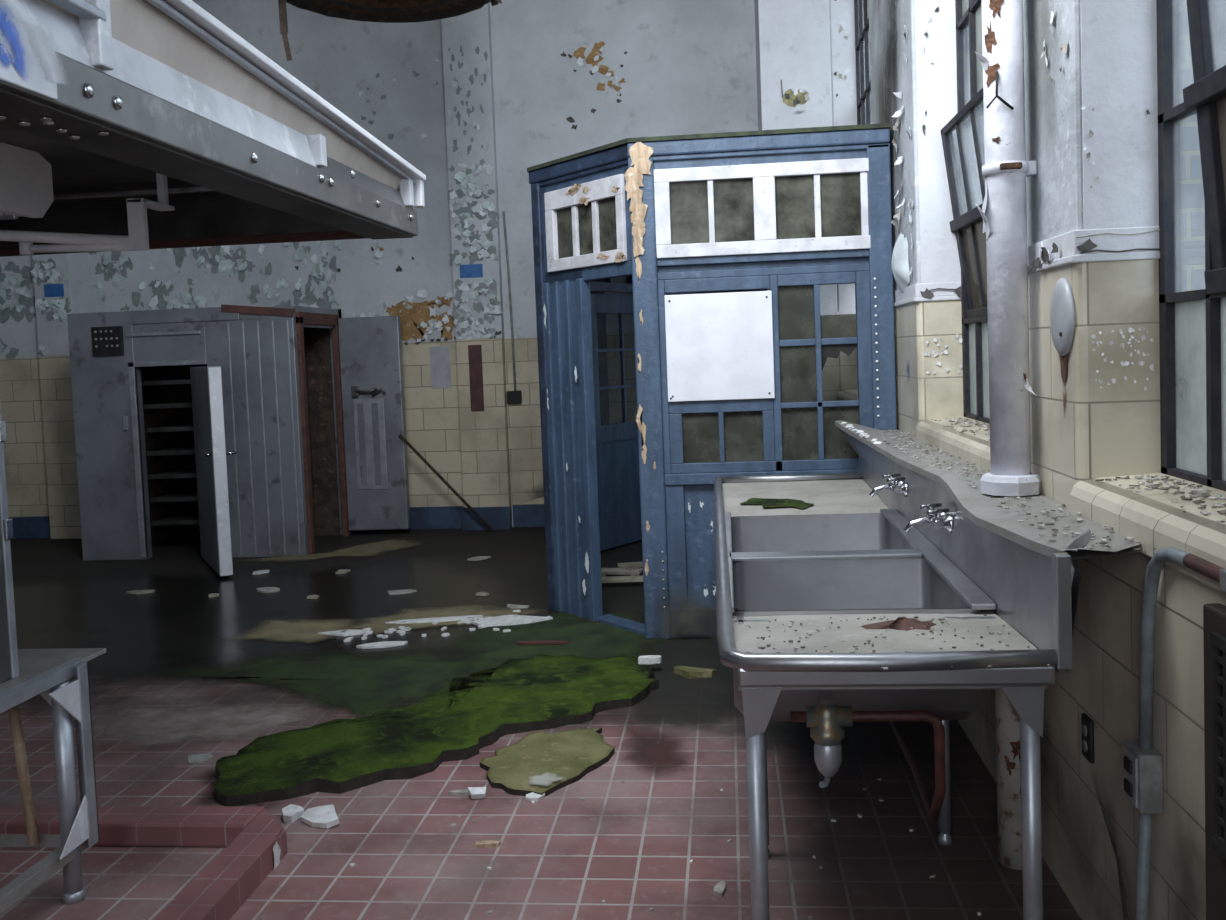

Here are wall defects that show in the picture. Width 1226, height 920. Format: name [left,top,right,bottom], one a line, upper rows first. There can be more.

peeling [560,41,627,103]
flaking render [781,80,809,113]
corrosion [984,0,1004,87]
peeling [351,46,503,346]
peeling [0,258,74,326]
peeling [89,240,342,312]
corrosion [1059,355,1067,412]
peeling [636,405,656,470]
leakage [530,773,562,786]
corrosion [1004,740,1020,776]